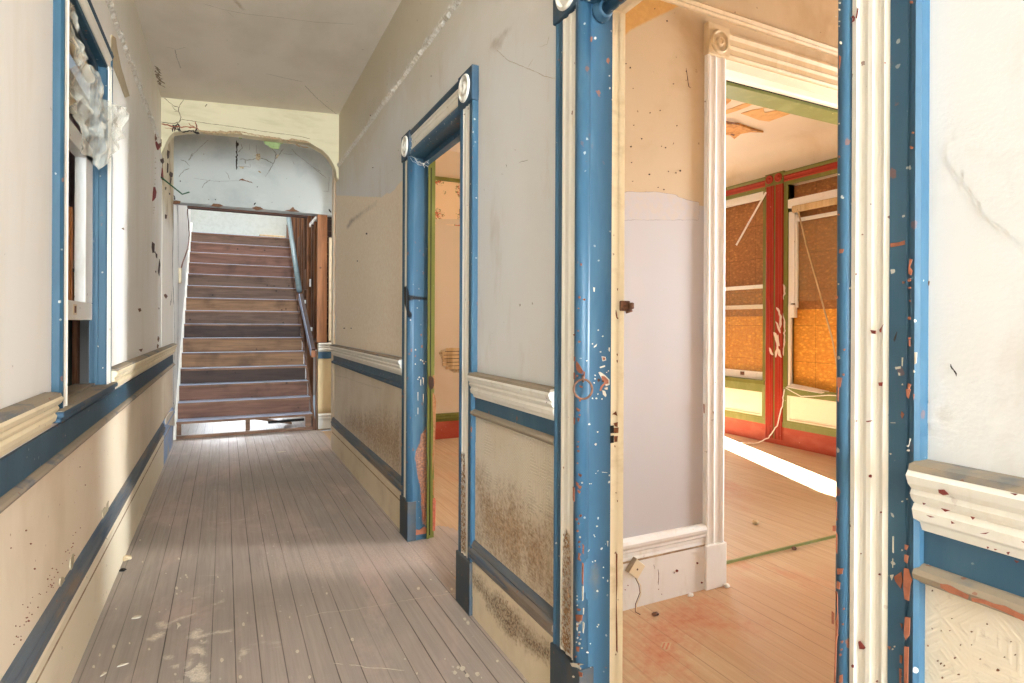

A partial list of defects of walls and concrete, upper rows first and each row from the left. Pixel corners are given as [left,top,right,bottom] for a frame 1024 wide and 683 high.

crack [162,98,329,192]
peeling [726,98,789,139]
damp [331,360,402,475]
flaking render [415,348,459,535]
peeling [573,329,610,446]
peeling [895,337,917,400]
damp [460,442,607,678]
peeling [570,514,604,678]
peeling [831,568,854,683]
peeling [878,536,912,601]
peeling [888,617,910,683]
peeling [932,584,1024,621]